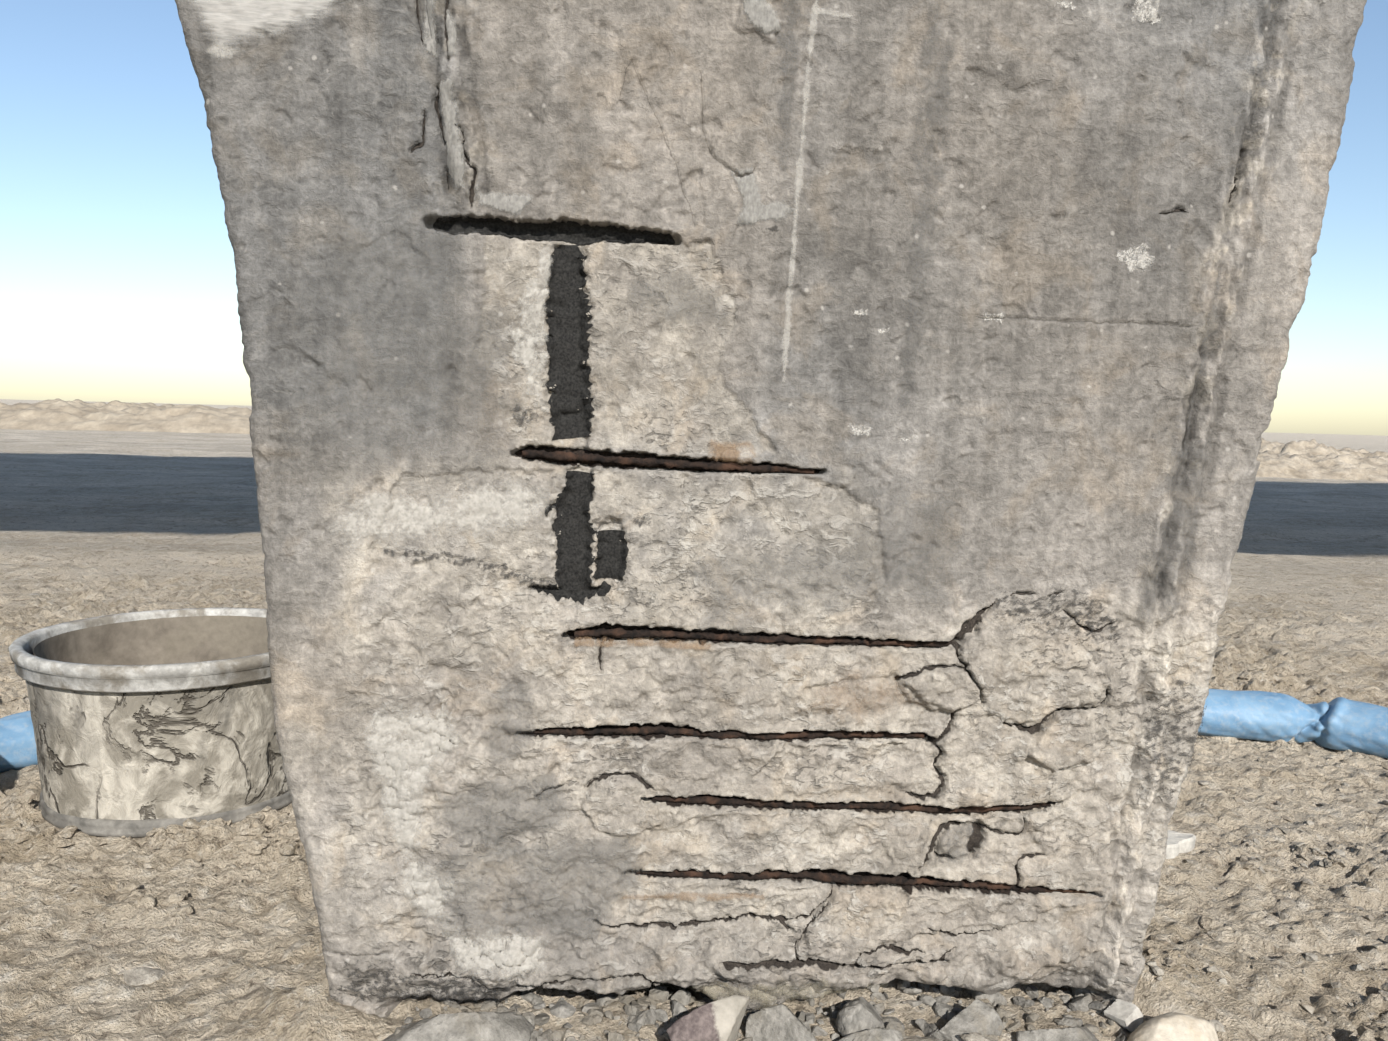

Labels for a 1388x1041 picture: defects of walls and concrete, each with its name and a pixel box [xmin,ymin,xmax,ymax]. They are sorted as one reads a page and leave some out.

crack [411,0,477,207]
peeling [439,78,465,188]
spalling [433,193,675,245]
crack [895,592,1111,801]
crack [539,773,652,795]
crack [979,818,1042,885]
crack [595,884,833,955]
crack [857,927,1003,962]